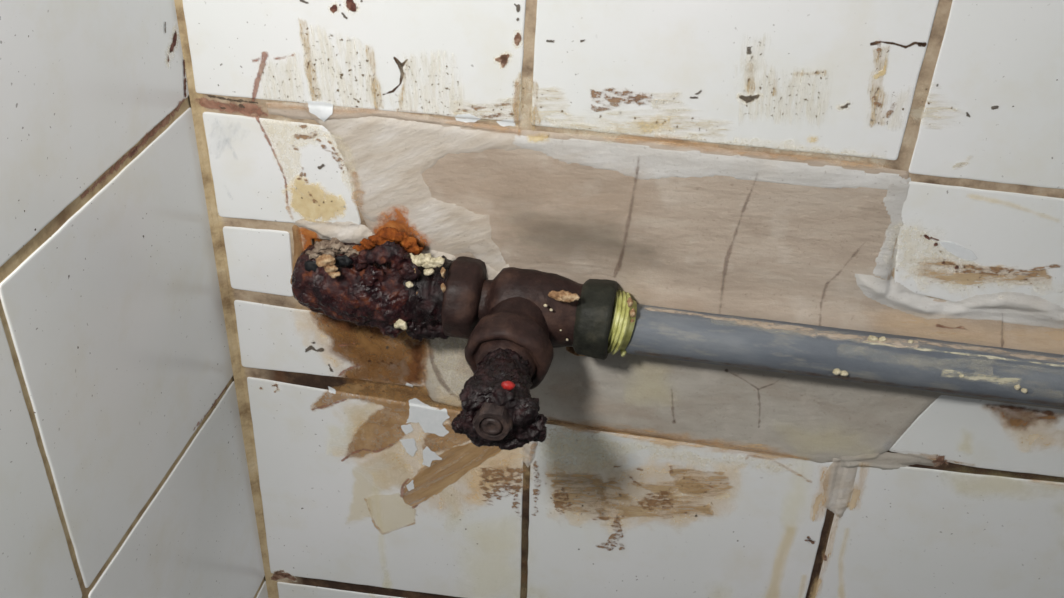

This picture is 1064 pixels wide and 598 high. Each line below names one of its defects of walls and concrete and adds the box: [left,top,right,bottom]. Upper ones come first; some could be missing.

water stain [286,172,363,222]
rust [352,209,427,255]
spalling [304,260,318,272]
rust [300,228,340,278]
spalling [335,255,353,267]
rust [305,311,529,508]
peeling [400,383,450,467]
rust [564,424,795,457]
rust [992,405,1057,428]
rust [553,490,572,513]
rust [593,516,625,550]